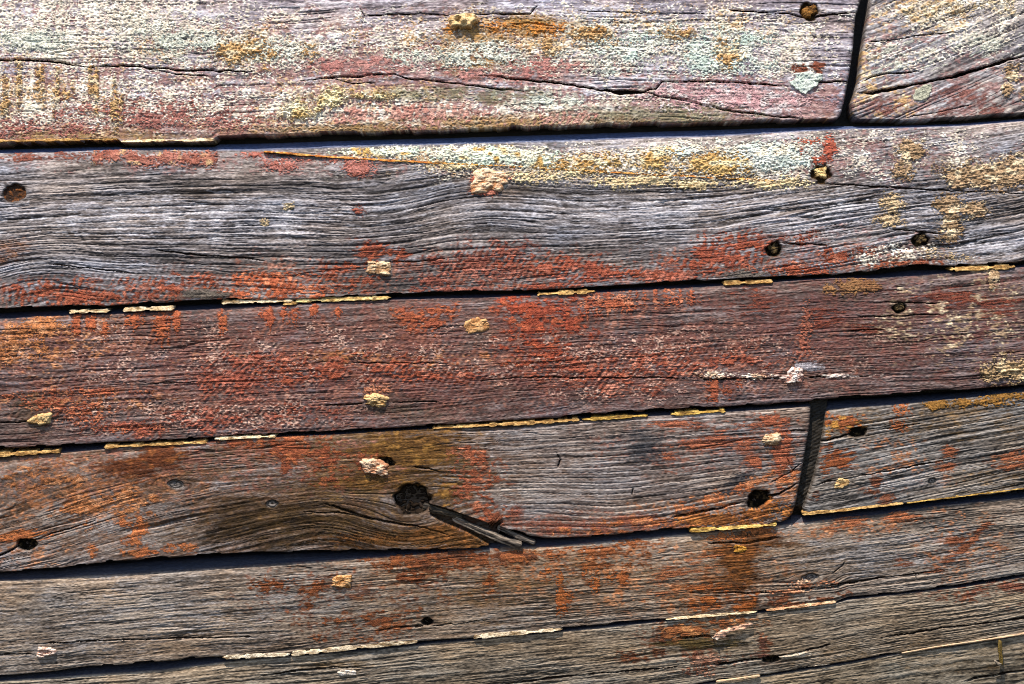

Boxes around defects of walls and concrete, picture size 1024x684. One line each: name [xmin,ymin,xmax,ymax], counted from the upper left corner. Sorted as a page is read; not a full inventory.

crack [0,59,253,76]
crack [303,74,797,119]
crack [818,56,1024,95]
peeling [911,286,1024,321]
peeling [0,228,944,487]
peeling [0,459,199,558]
peeling [361,411,800,618]
peeling [927,517,1010,573]
peeling [247,575,330,610]
peeling [308,605,423,643]